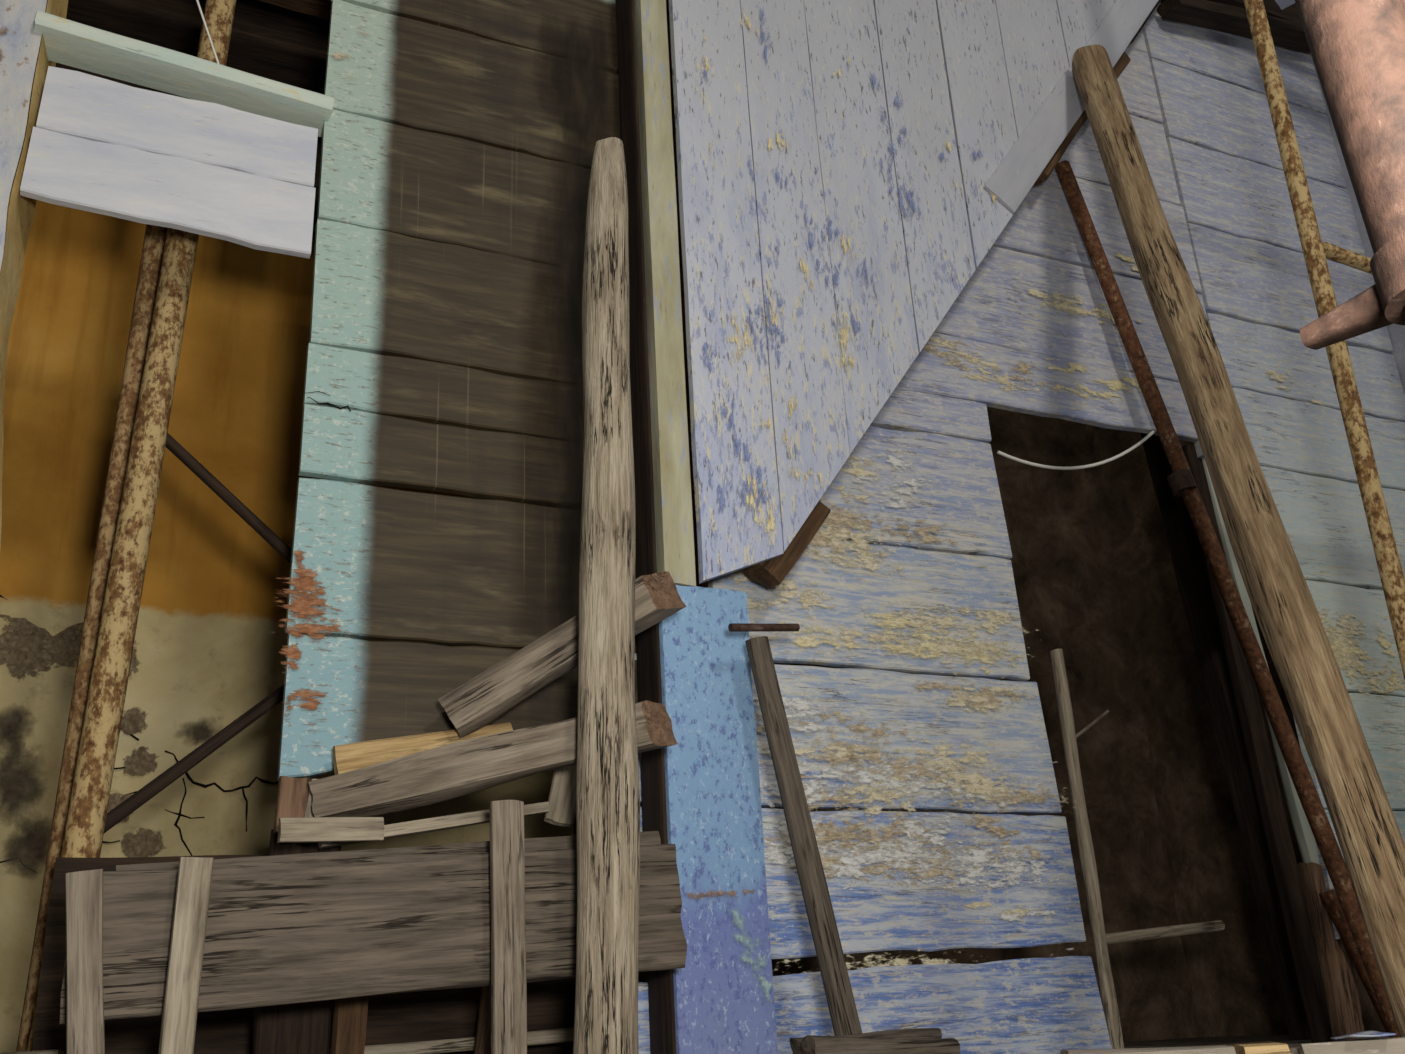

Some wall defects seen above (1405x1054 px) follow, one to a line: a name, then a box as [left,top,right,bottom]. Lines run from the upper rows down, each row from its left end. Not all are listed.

peeling [748,128,792,194]
peeling [870,93,923,236]
peeling [799,210,876,370]
peeling [923,335,1141,403]
peeling [1012,283,1118,331]
peeling [703,279,1037,713]
water stain [0,709,51,874]
crack [114,728,279,856]
peeling [753,696,798,875]
peeling [781,693,1084,924]
peeling [846,938,952,969]